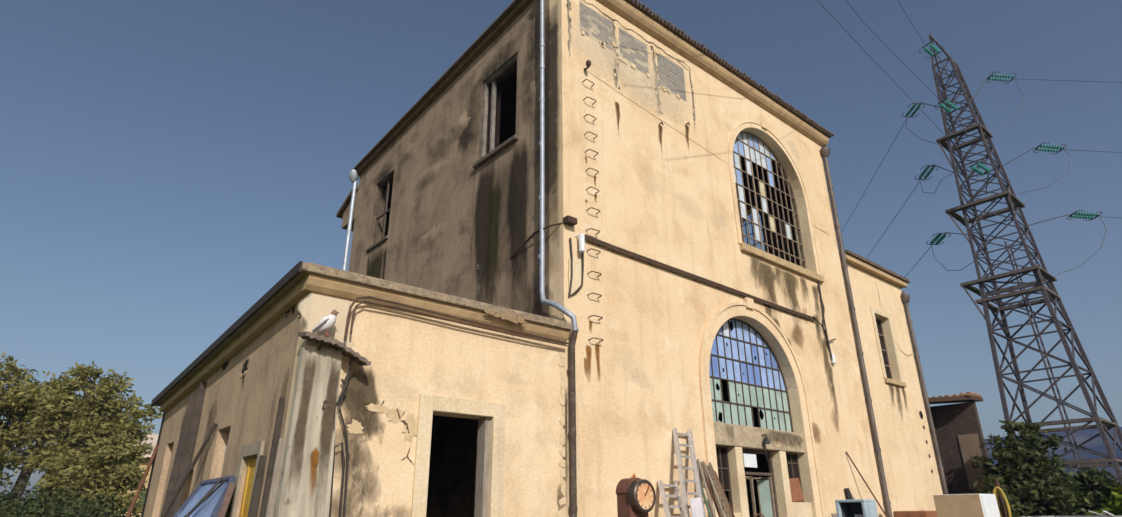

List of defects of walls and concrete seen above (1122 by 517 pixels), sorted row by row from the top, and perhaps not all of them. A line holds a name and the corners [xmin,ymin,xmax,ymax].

leakage [475,145,527,297]
leakage [367,251,386,279]
leakage [293,361,316,471]
leakage [320,364,377,517]
peeling [347,419,364,434]
peeling [366,403,418,442]
rust [311,448,319,484]